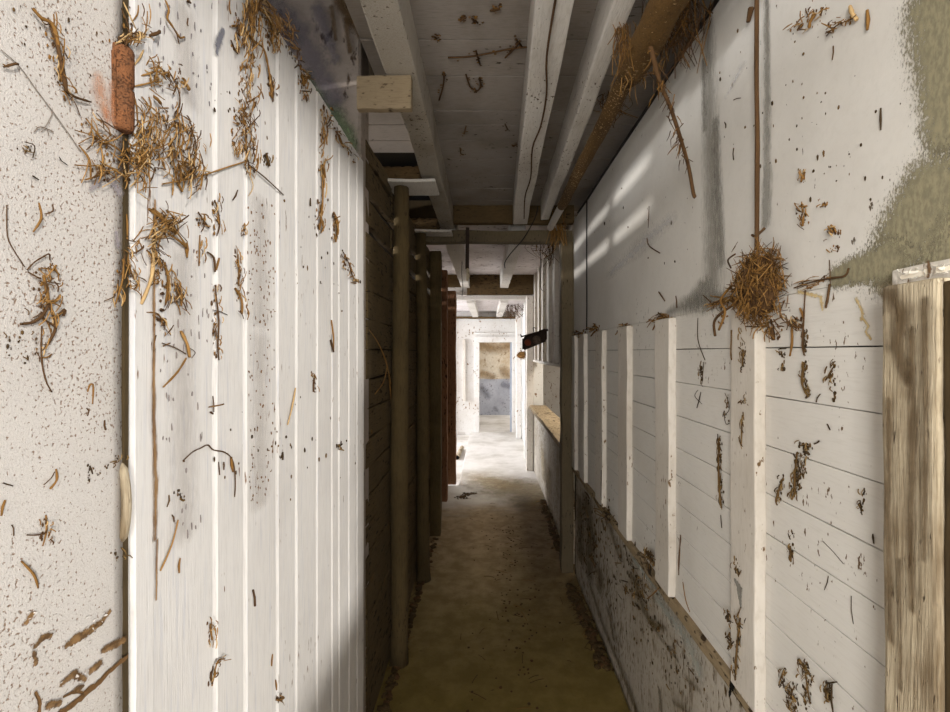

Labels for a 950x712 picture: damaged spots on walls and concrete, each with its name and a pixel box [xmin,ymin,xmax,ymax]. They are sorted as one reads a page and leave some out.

damp [265,0,352,105]